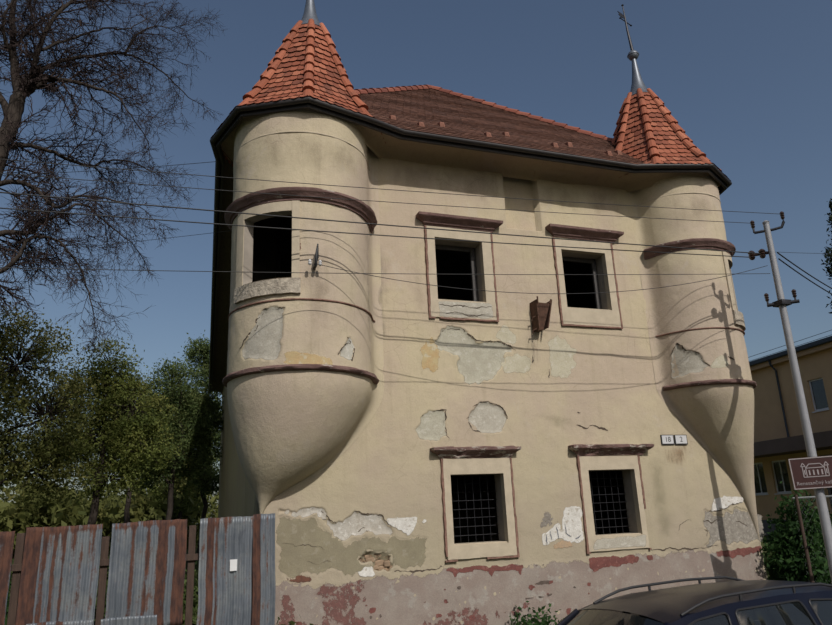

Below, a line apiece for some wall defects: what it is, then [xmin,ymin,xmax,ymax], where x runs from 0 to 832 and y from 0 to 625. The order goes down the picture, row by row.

flaking render [240,307,285,360]
flaking render [338,337,355,361]
flaking render [435,326,516,384]
flaking render [671,343,710,378]
flaking render [416,409,449,441]
flaking render [468,401,508,433]
flaking render [711,496,744,512]
flaking render [285,507,426,541]
peeling [276,552,393,625]
peeling [446,564,523,589]
peeling [423,589,529,625]